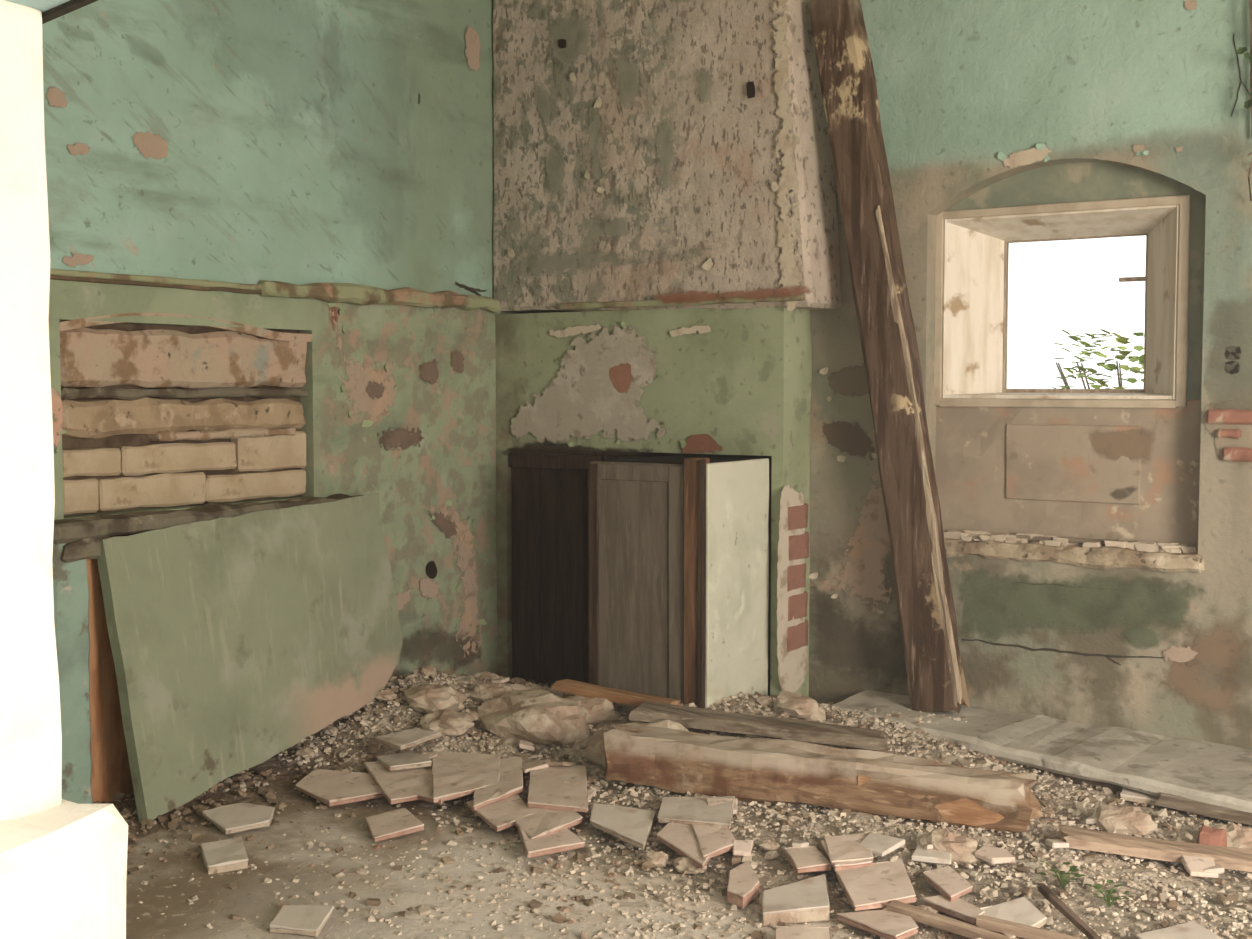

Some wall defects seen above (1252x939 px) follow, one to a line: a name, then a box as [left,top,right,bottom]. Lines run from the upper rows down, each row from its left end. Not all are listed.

peeling [546,4,590,82]
peeling [46,87,68,108]
peeling [132,131,168,159]
peeling [62,253,94,267]
peeling [670,325,711,337]
peeling [510,322,666,447]
peeling [50,368,67,453]
flaking render [679,434,723,454]
flaking render [1202,400,1252,466]
flaking render [777,421,892,692]
crack [962,639,1163,666]